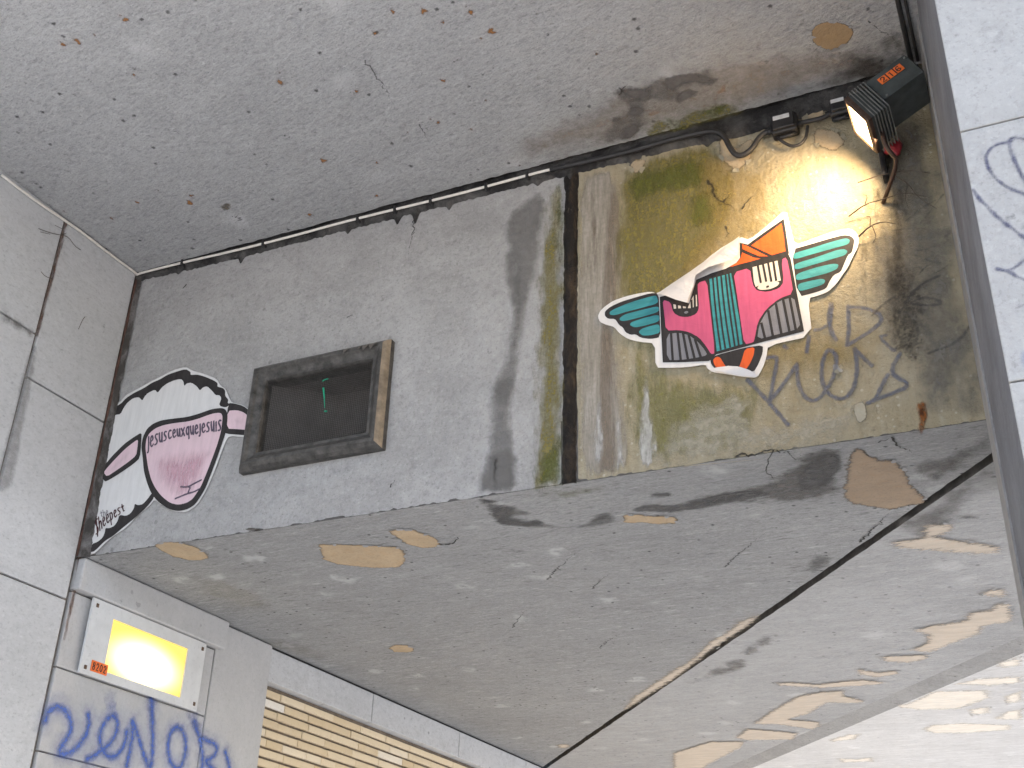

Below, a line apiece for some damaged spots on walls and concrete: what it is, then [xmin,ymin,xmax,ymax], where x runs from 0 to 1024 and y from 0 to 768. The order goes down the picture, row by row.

leakage [594,74,718,139]
leakage [875,123,969,393]
leakage [482,198,543,527]
corrosion [917,402,927,432]
leakage [635,450,839,512]
crack [735,449,801,478]
peeling [843,449,927,511]
peeling [319,529,443,568]
leakage [582,514,611,527]
peeling [893,523,1001,555]
peeling [623,616,758,710]
peeling [671,589,1024,768]